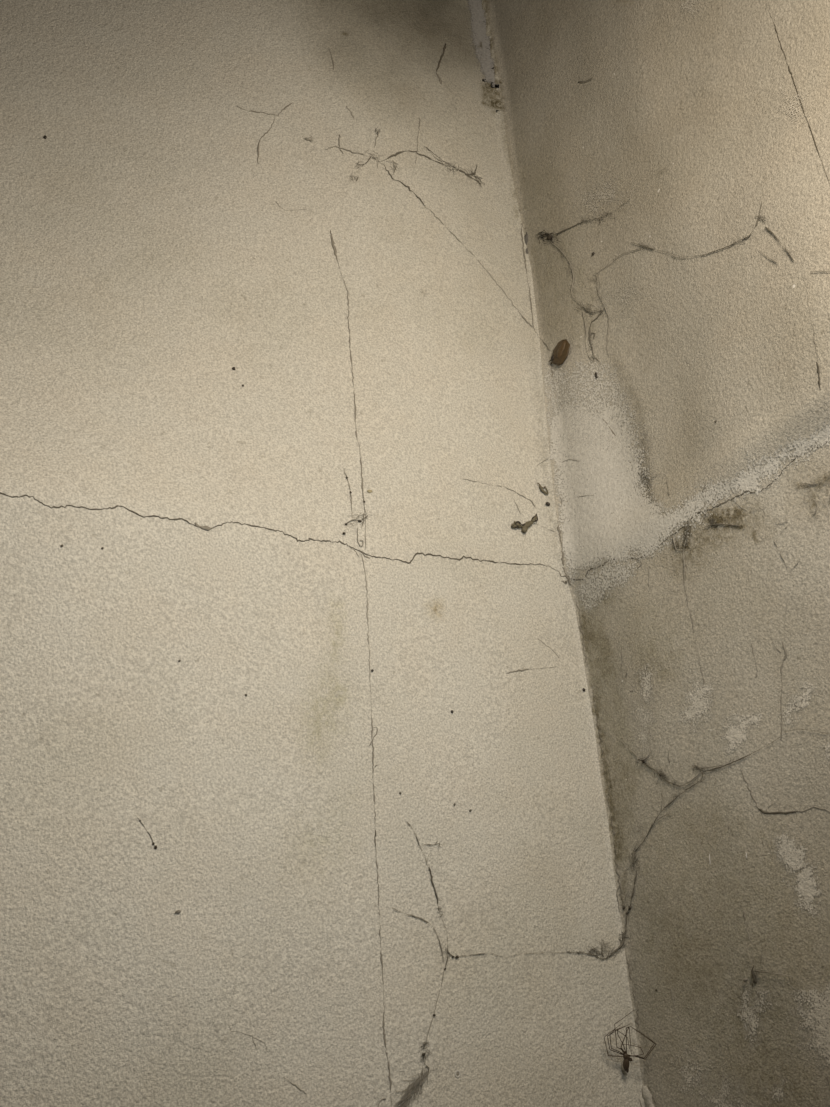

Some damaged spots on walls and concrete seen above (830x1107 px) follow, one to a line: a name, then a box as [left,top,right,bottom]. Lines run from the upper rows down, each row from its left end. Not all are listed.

crack [237,103,292,164]
crack [0,224,830,1106]
leakage [674,674,765,755]
leakage [766,827,827,918]
leakage [737,974,830,1069]